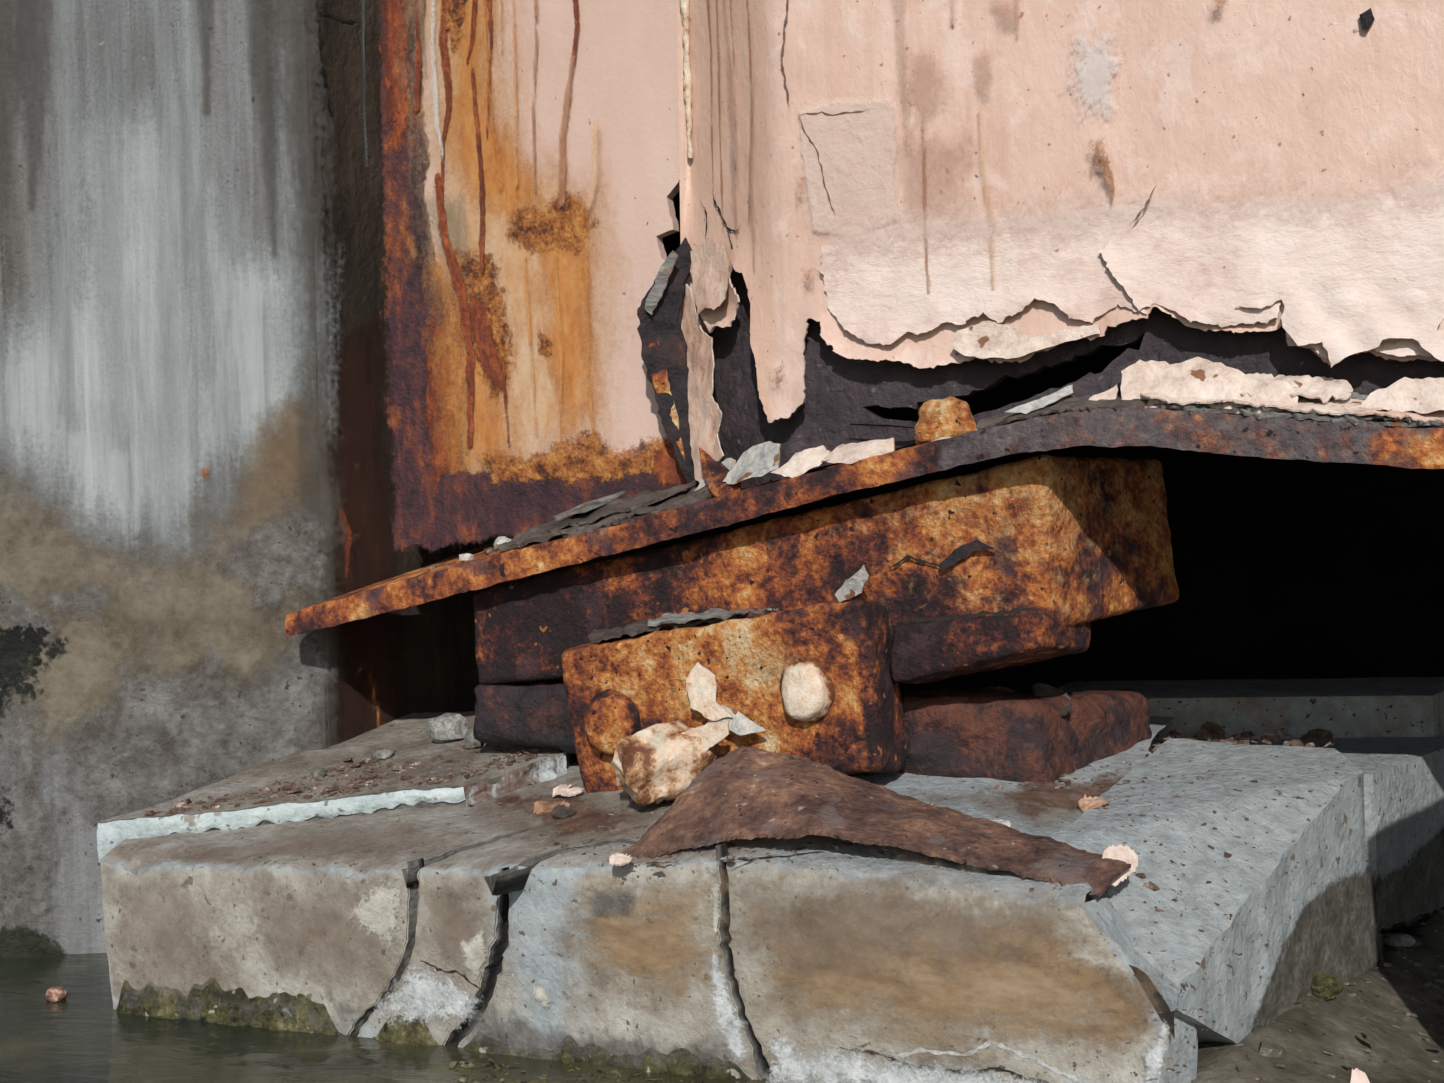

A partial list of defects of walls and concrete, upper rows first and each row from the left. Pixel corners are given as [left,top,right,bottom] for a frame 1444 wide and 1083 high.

damp [0,0,335,754]
corrosion [326,0,741,598]
peeling [682,238,895,491]
peeling [821,179,1444,368]
peeling [1005,357,1299,414]
corrosion [972,350,1444,429]
peeling [1359,377,1444,414]
corrosion [332,611,400,736]
damp [117,883,210,1005]
damp [267,886,379,977]
crack [348,821,637,1046]
crack [713,842,824,1080]